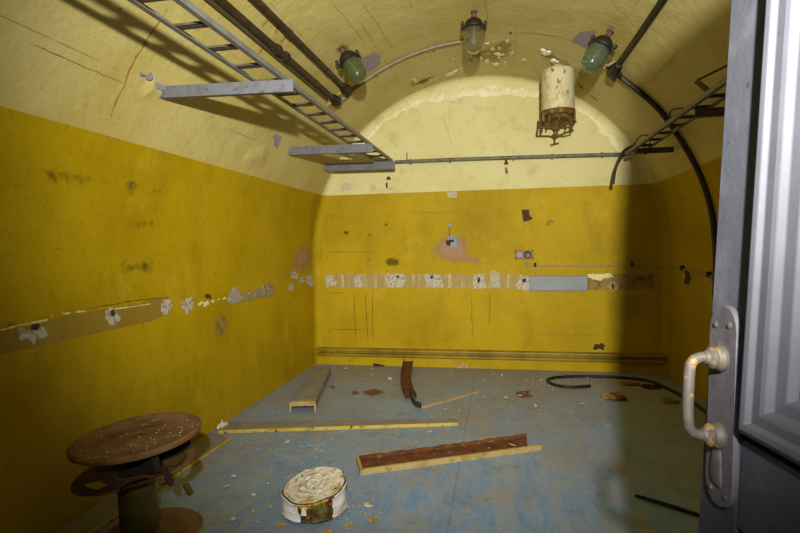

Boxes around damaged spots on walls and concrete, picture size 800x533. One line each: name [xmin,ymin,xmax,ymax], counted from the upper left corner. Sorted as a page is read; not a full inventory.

peeling [468,32,526,71]
spalling [446,235,457,247]
spalling [386,273,405,288]
spalling [424,274,443,288]
spalling [472,271,500,289]
spalling [515,276,529,291]
spalling [161,283,274,315]
spalling [105,303,150,326]
spalling [0,310,85,345]